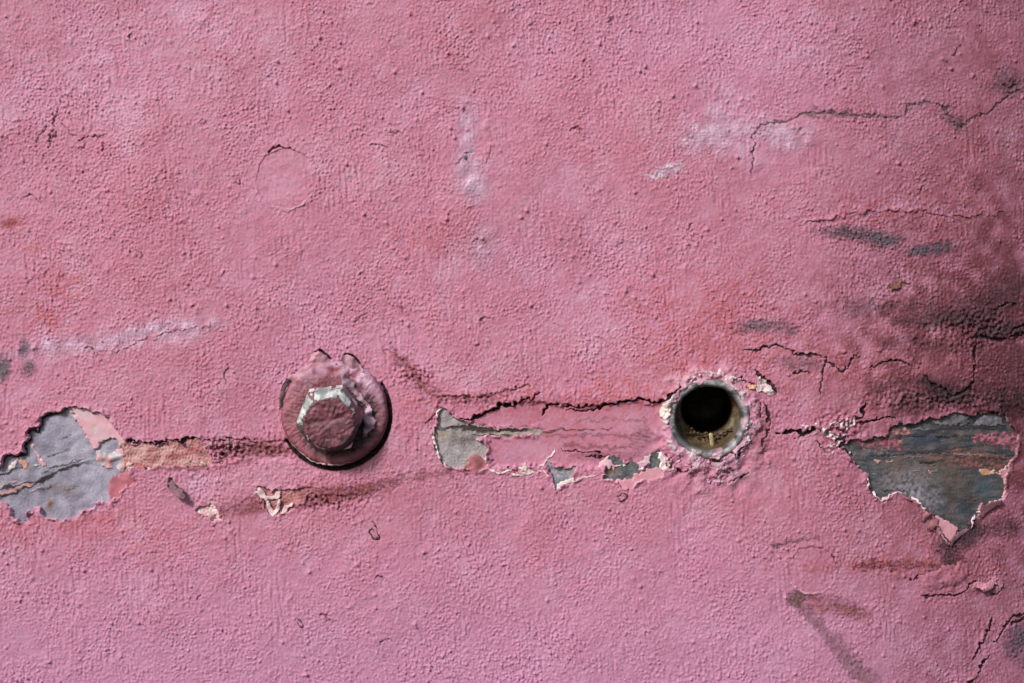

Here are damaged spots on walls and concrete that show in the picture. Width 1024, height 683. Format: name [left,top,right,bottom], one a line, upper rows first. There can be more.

crack [750,84,1023,173]
peeling [0,406,238,523]
corrosion [219,443,289,458]
crack [383,349,681,424]
peeling [432,408,756,491]
peeling [659,401,672,420]
crack [666,302,1024,486]
peeling [801,412,1017,547]